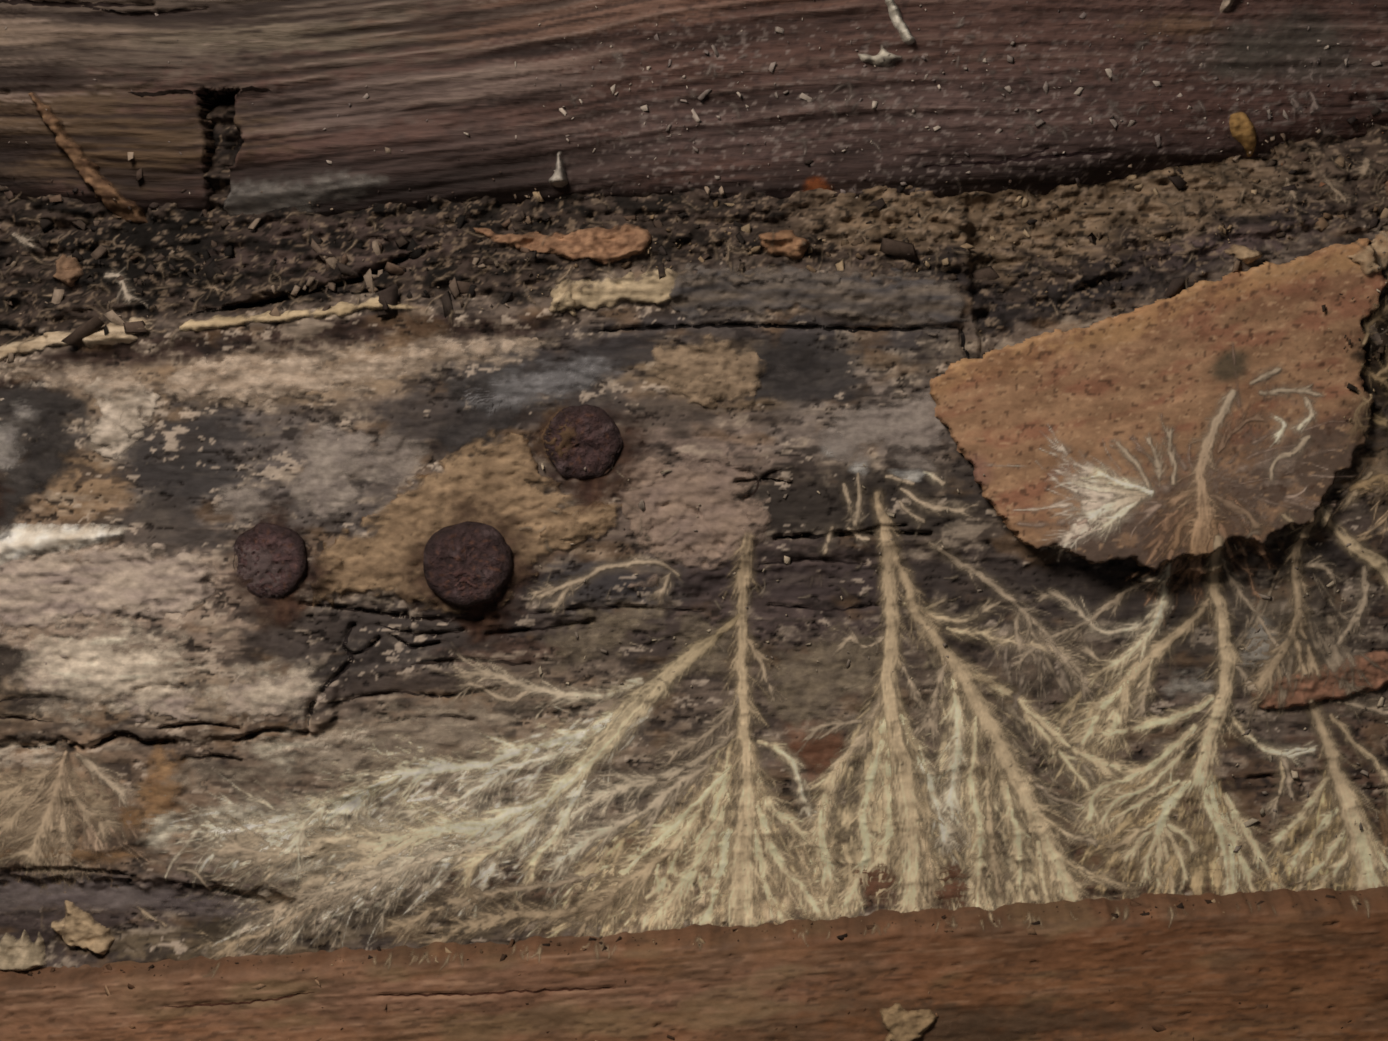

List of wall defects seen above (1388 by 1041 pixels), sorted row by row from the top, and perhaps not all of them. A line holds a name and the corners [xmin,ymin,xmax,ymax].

crack [128,86,271,191]
corrosion [405,519,535,641]
crack [769,603,877,611]
water stain [0,620,186,713]
water stain [248,669,313,710]
crack [0,604,702,760]
water stain [257,702,516,776]
water stain [788,731,843,771]
water stain [220,803,410,868]
water stain [857,869,896,896]
water stain [937,865,968,906]